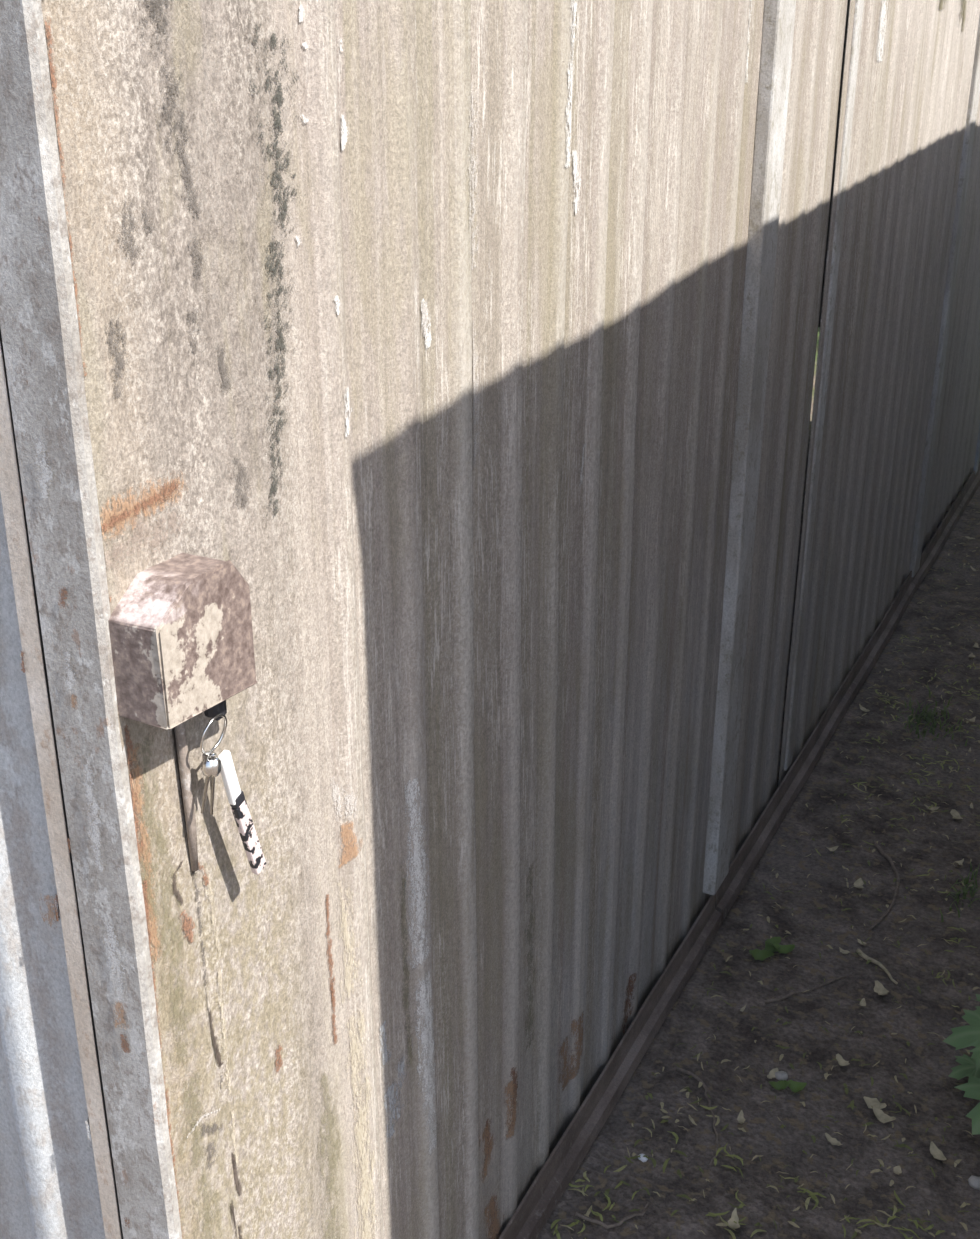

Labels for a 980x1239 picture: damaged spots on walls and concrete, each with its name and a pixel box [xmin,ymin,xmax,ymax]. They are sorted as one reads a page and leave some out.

damp [140,0,190,156]
corrosion [100,473,185,568]